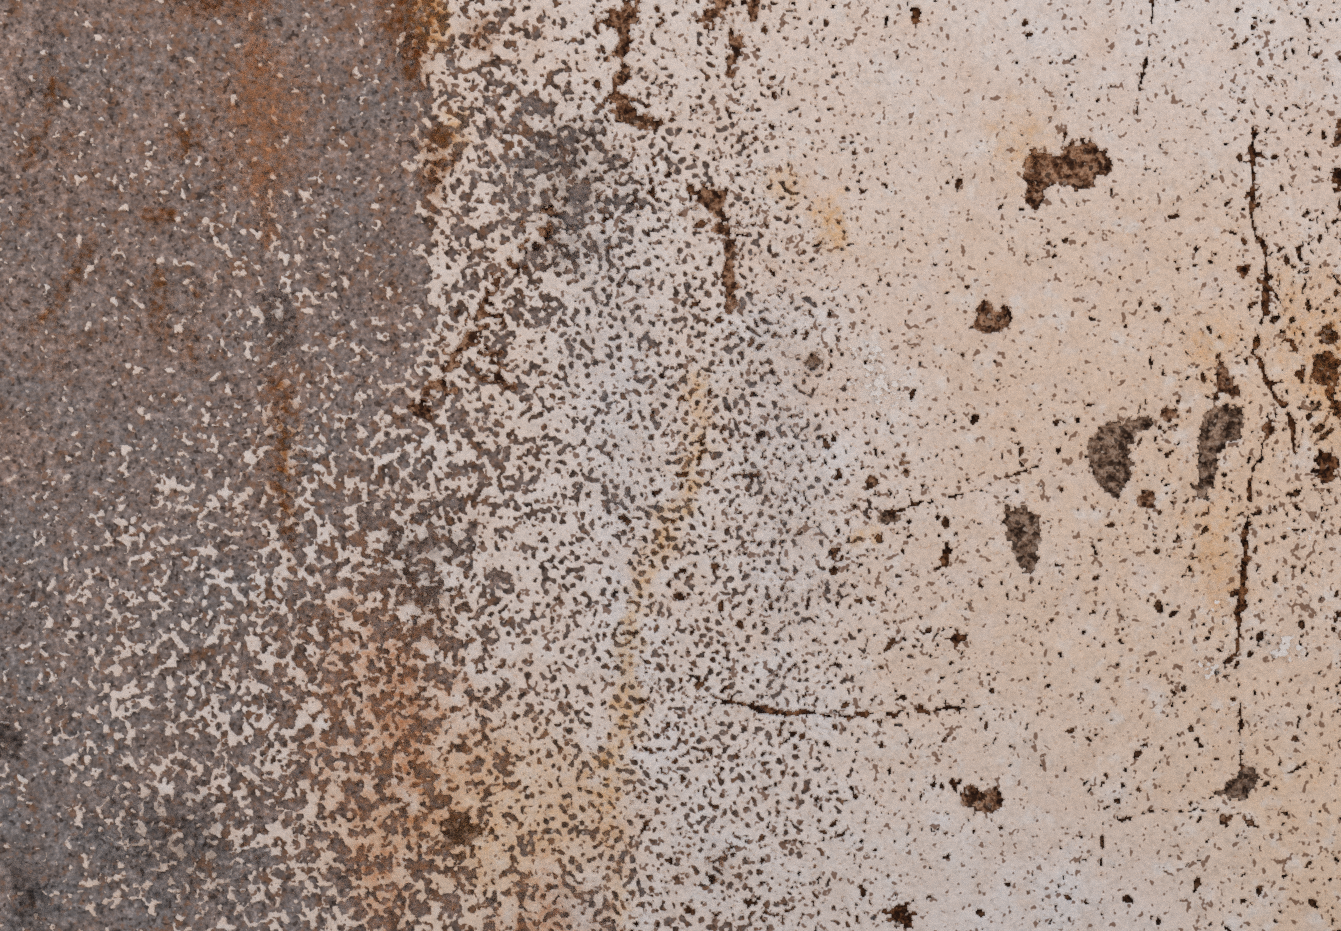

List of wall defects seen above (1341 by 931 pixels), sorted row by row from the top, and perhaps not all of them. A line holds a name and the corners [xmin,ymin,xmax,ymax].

spalling [1222,1,1339,122]
spalling [998,131,1121,220]
spalling [944,285,1019,340]
spalling [1053,102,1341,614]
crack [1229,110,1333,787]
spalling [973,496,1179,648]
spalling [1191,622,1274,679]
spalling [1298,590,1341,656]
crack [686,691,980,722]
spalling [1083,724,1164,810]
spalling [906,774,1012,847]
crack [1079,792,1218,876]